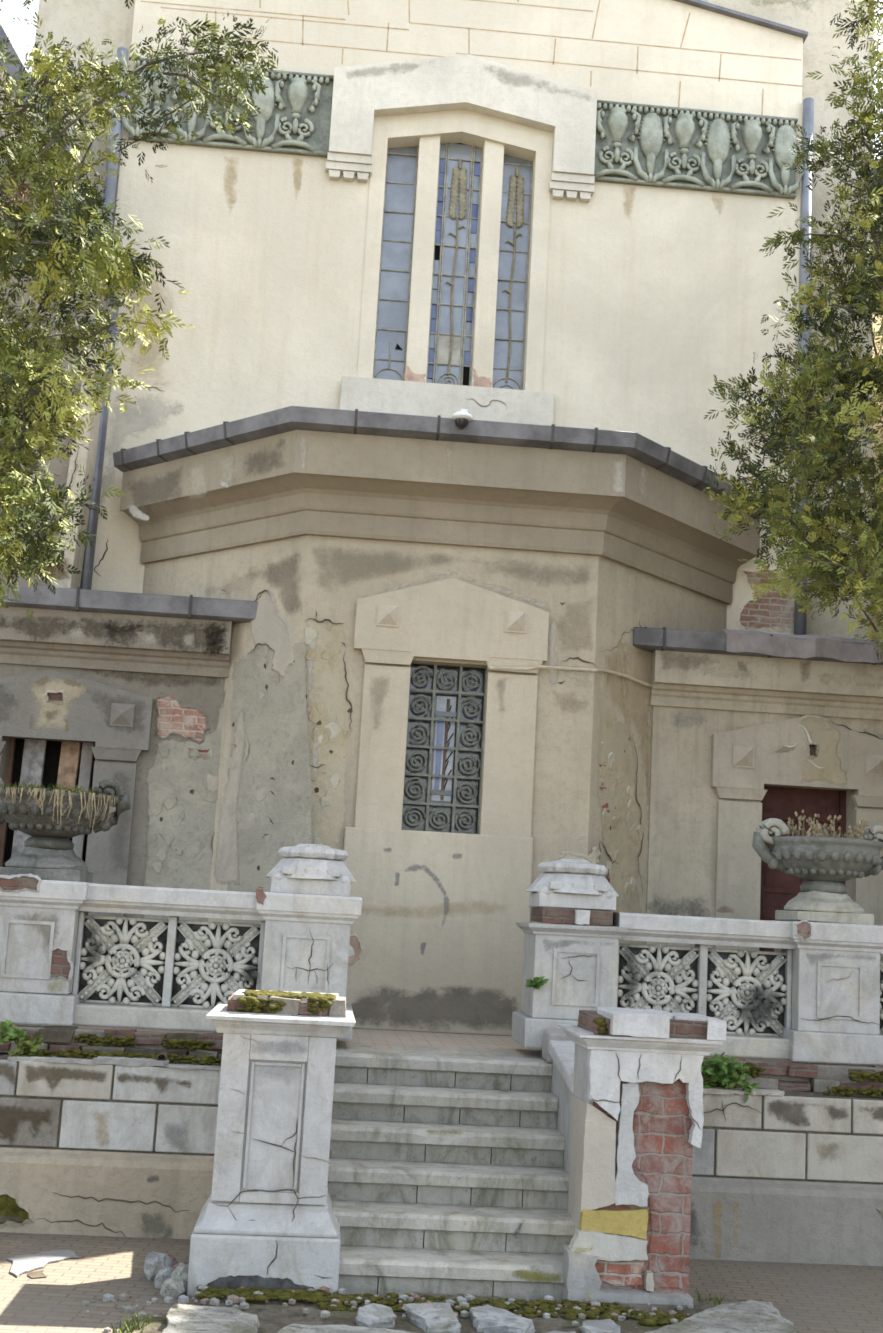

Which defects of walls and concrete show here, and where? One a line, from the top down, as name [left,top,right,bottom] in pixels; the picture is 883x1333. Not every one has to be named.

spalling [735,567,794,633]
crack [306,612,352,726]
flaking render [142,589,352,924]
crack [288,929,333,984]
leakage [352,988,515,1027]
leakage [0,1064,190,1091]
leakage [0,1106,50,1141]
crack [41,1124,331,1275]